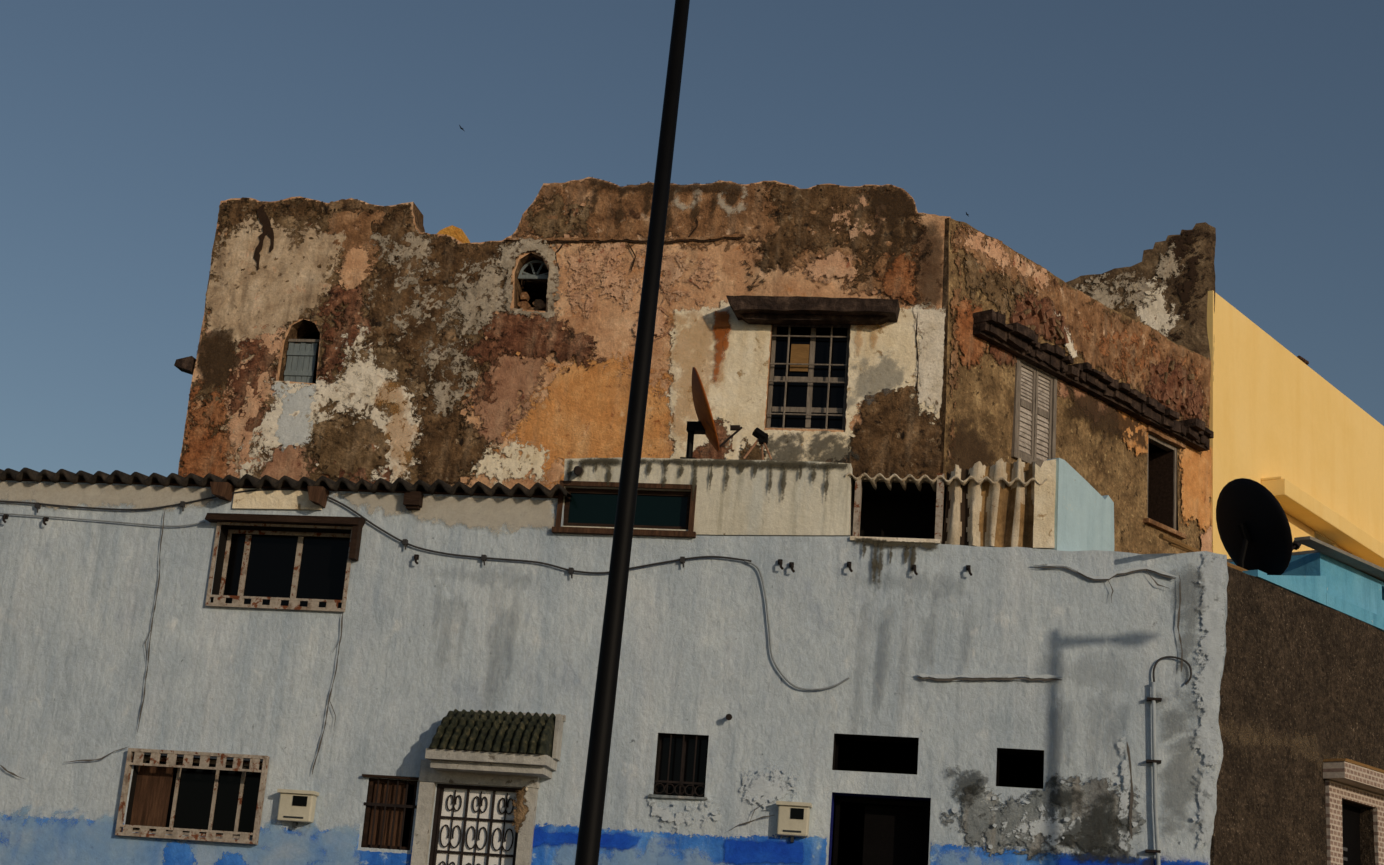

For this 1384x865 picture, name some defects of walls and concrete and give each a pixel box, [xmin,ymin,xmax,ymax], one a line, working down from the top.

peeling [0,182,1078,532]
spalling [1068,226,1212,420]
spalling [938,736,1146,865]